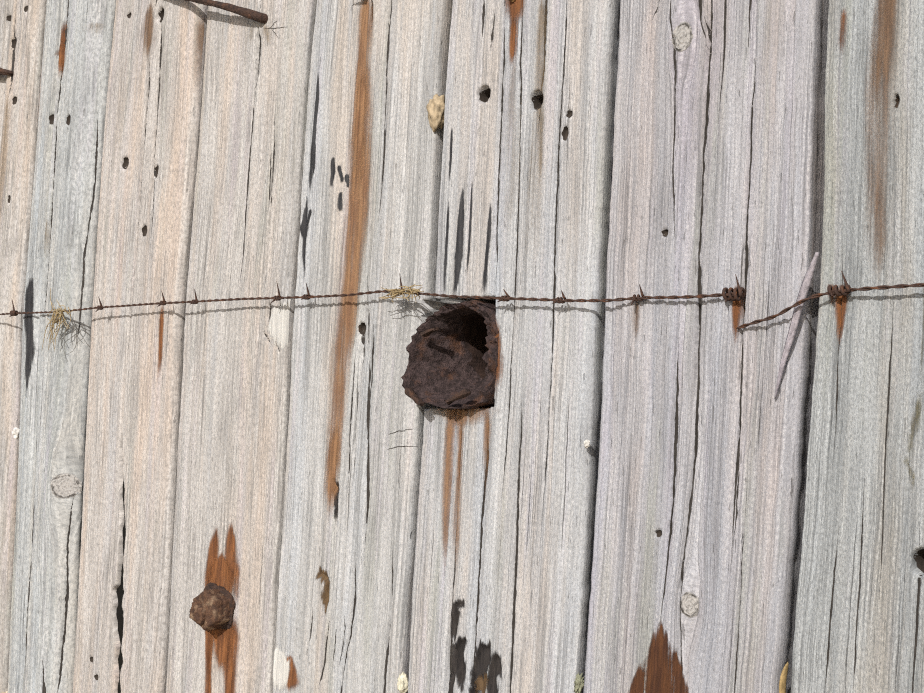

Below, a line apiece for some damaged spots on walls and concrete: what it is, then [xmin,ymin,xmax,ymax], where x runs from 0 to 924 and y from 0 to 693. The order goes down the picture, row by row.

corrosion [506,0,523,60]
corrosion [876,0,896,115]
corrosion [327,0,372,501]
corrosion [732,292,743,336]
corrosion [830,286,847,335]
corrosion [405,388,425,406]
corrosion [443,408,489,546]
crack [116,480,126,693]
corrosion [205,526,239,593]
corrosion [205,624,238,693]
corrosion [630,624,688,693]